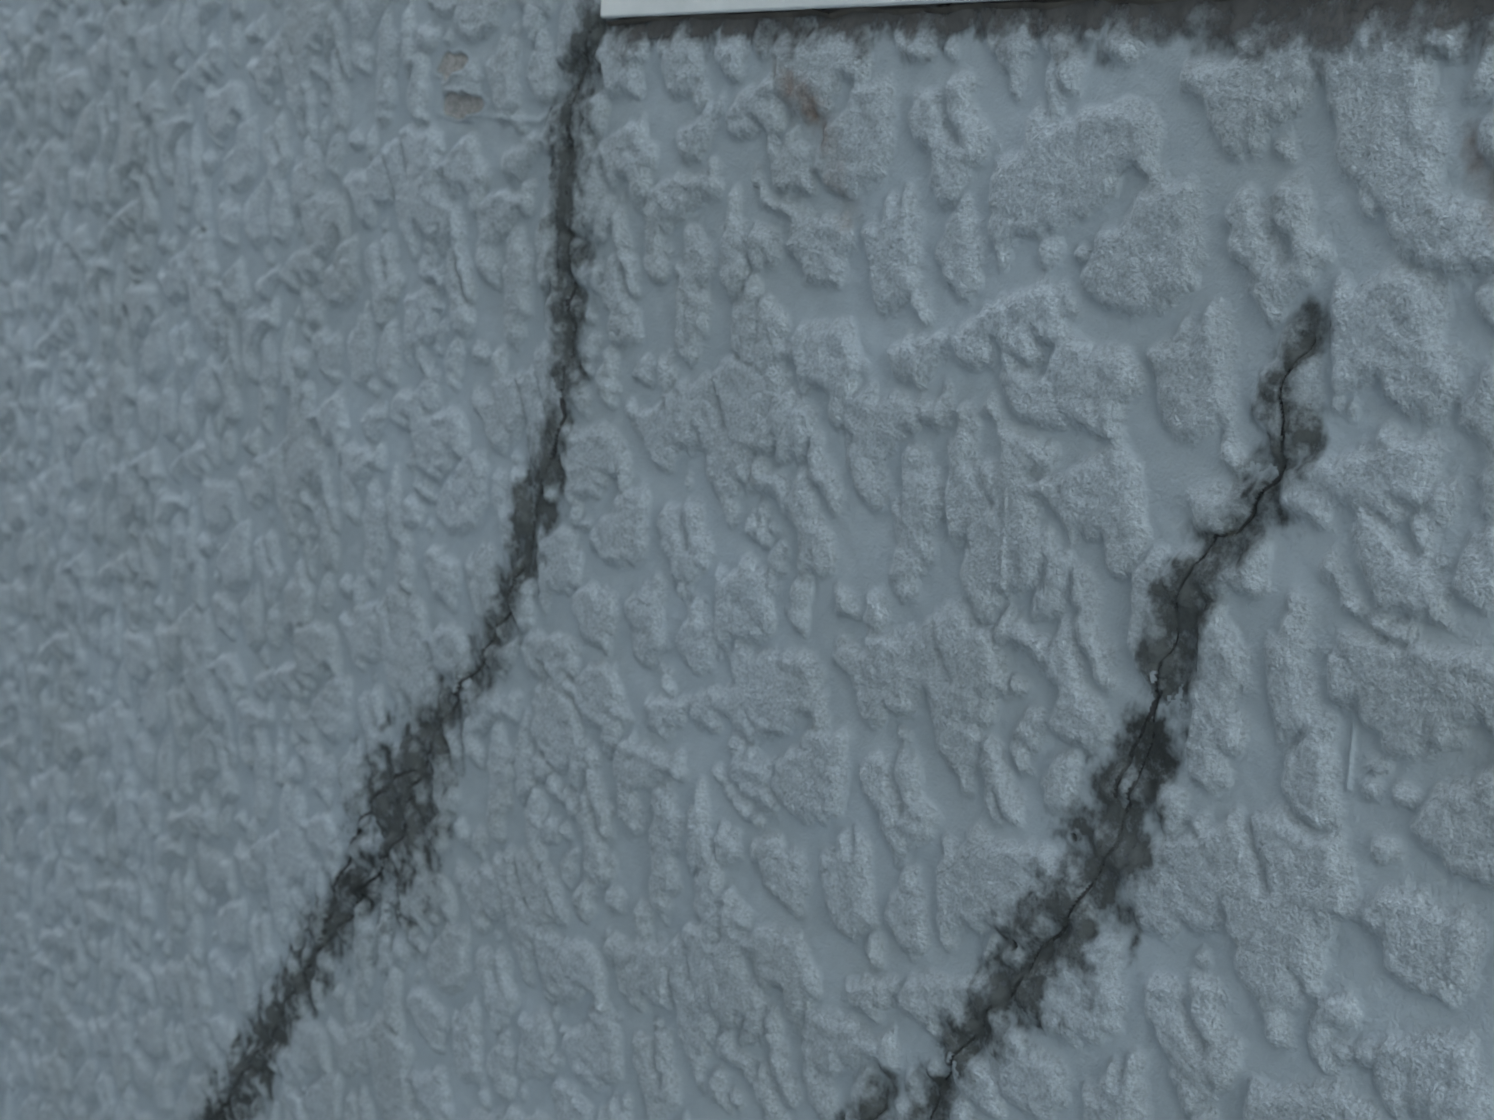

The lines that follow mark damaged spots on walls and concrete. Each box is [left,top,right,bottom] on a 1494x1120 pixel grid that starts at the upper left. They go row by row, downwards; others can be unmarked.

crack [551,365,567,459]
crack [1197,370,1292,563]
crack [1113,635,1178,808]
crack [221,517,537,1113]
crack [1034,885,1092,962]
crack [930,1006,992,1120]